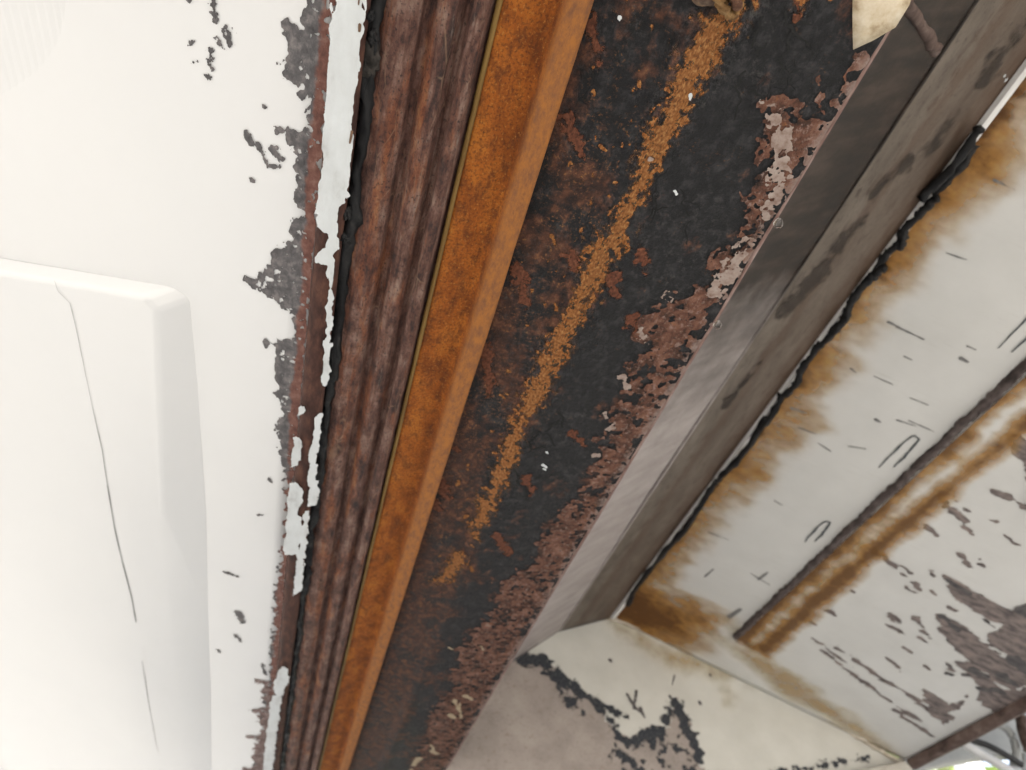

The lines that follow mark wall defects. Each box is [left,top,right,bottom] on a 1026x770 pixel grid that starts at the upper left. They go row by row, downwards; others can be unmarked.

peeling [192,0,233,81]
rust [788,0,808,24]
crack [55,283,136,621]
peeling [233,610,246,642]
peeling [242,0,367,770]
rust [427,0,759,586]
peeling [409,51,870,770]
rust [616,77,1026,665]
rust [735,376,1026,733]
peeling [808,556,1026,737]
peeling [942,500,974,536]
peeling [990,489,1026,510]